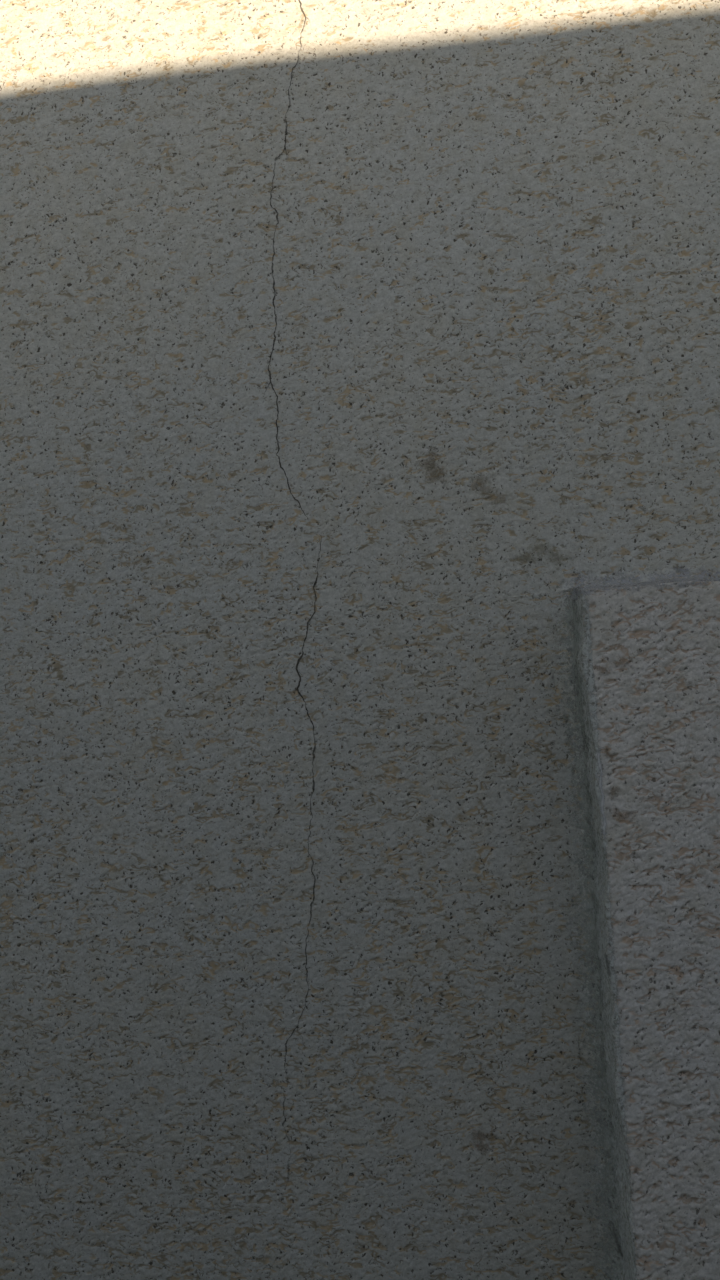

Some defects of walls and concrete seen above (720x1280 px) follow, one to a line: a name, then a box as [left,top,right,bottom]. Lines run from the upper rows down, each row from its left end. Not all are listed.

crack [266,0,322,1137]